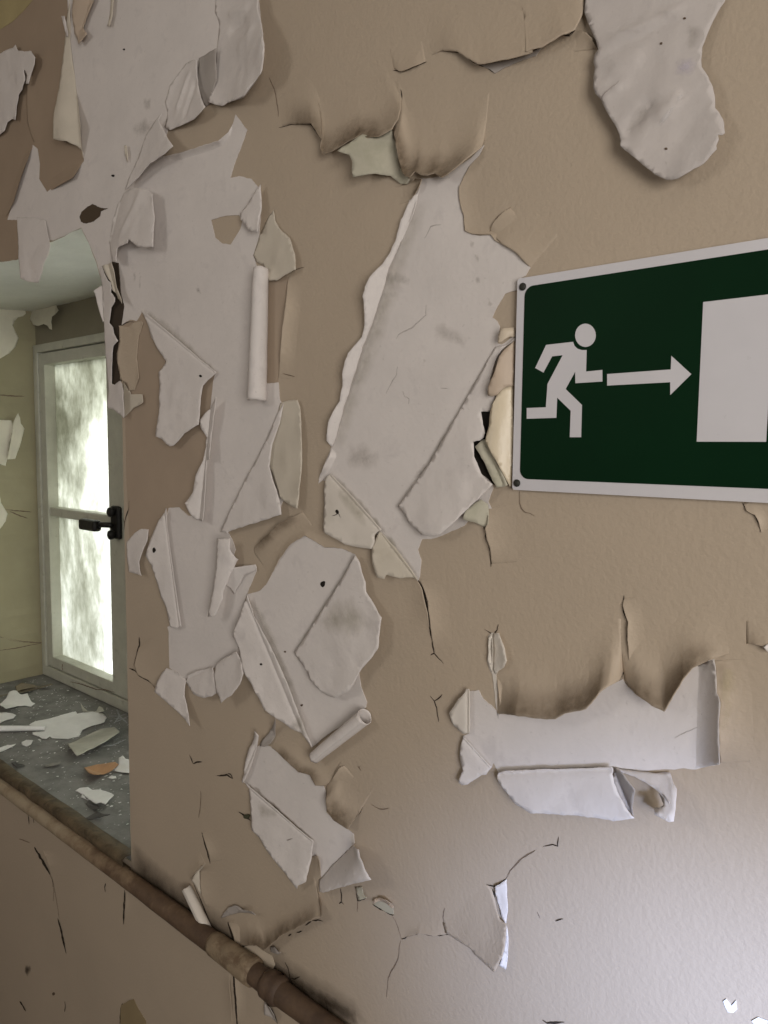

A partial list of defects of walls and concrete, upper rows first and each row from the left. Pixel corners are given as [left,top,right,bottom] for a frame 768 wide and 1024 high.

peeling [584,0,725,180]
peeling [0,0,558,915]
crack [397,579,452,664]
peeling [449,600,753,822]
crack [20,816,66,952]